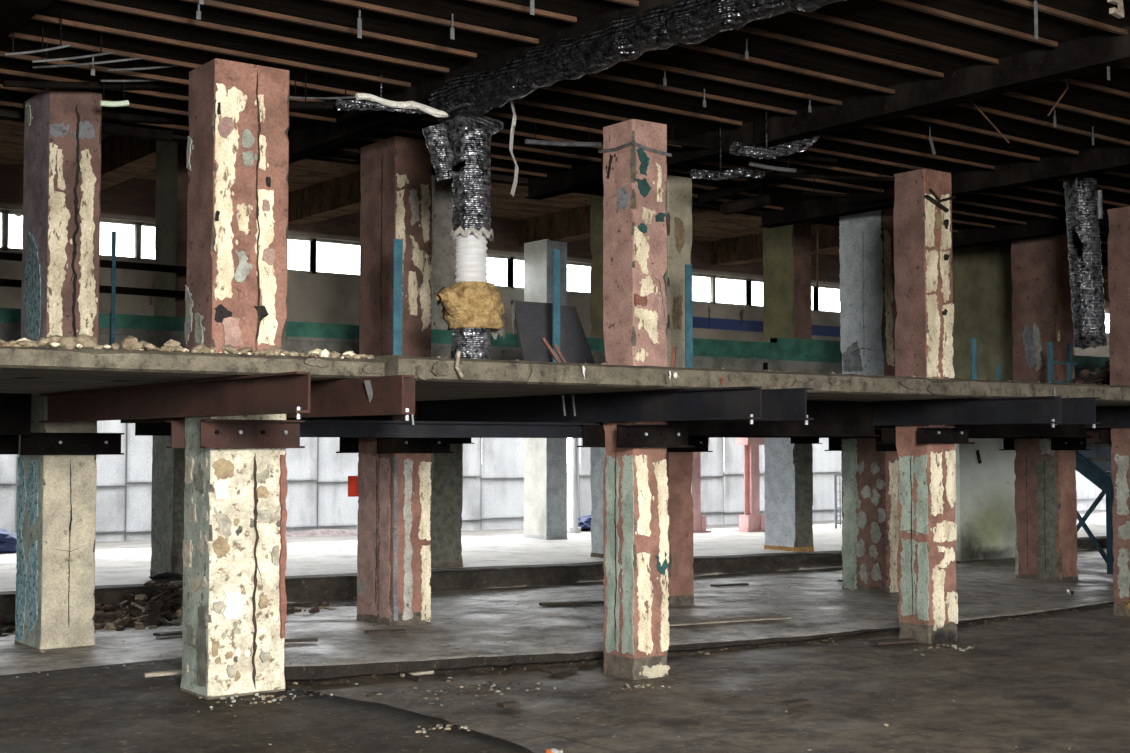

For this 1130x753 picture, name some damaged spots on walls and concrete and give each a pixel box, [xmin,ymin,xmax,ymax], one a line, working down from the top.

peeling [23,121,99,340]
crack [70,104,81,337]
peeling [184,83,278,347]
peeling [898,193,955,394]
flaking render [182,455,288,686]
crack [250,453,262,689]
peeling [357,452,431,622]
crack [285,454,617,681]
peeling [605,454,670,679]
crack [668,459,925,652]
peeling [888,450,958,631]
crack [956,602,1114,625]